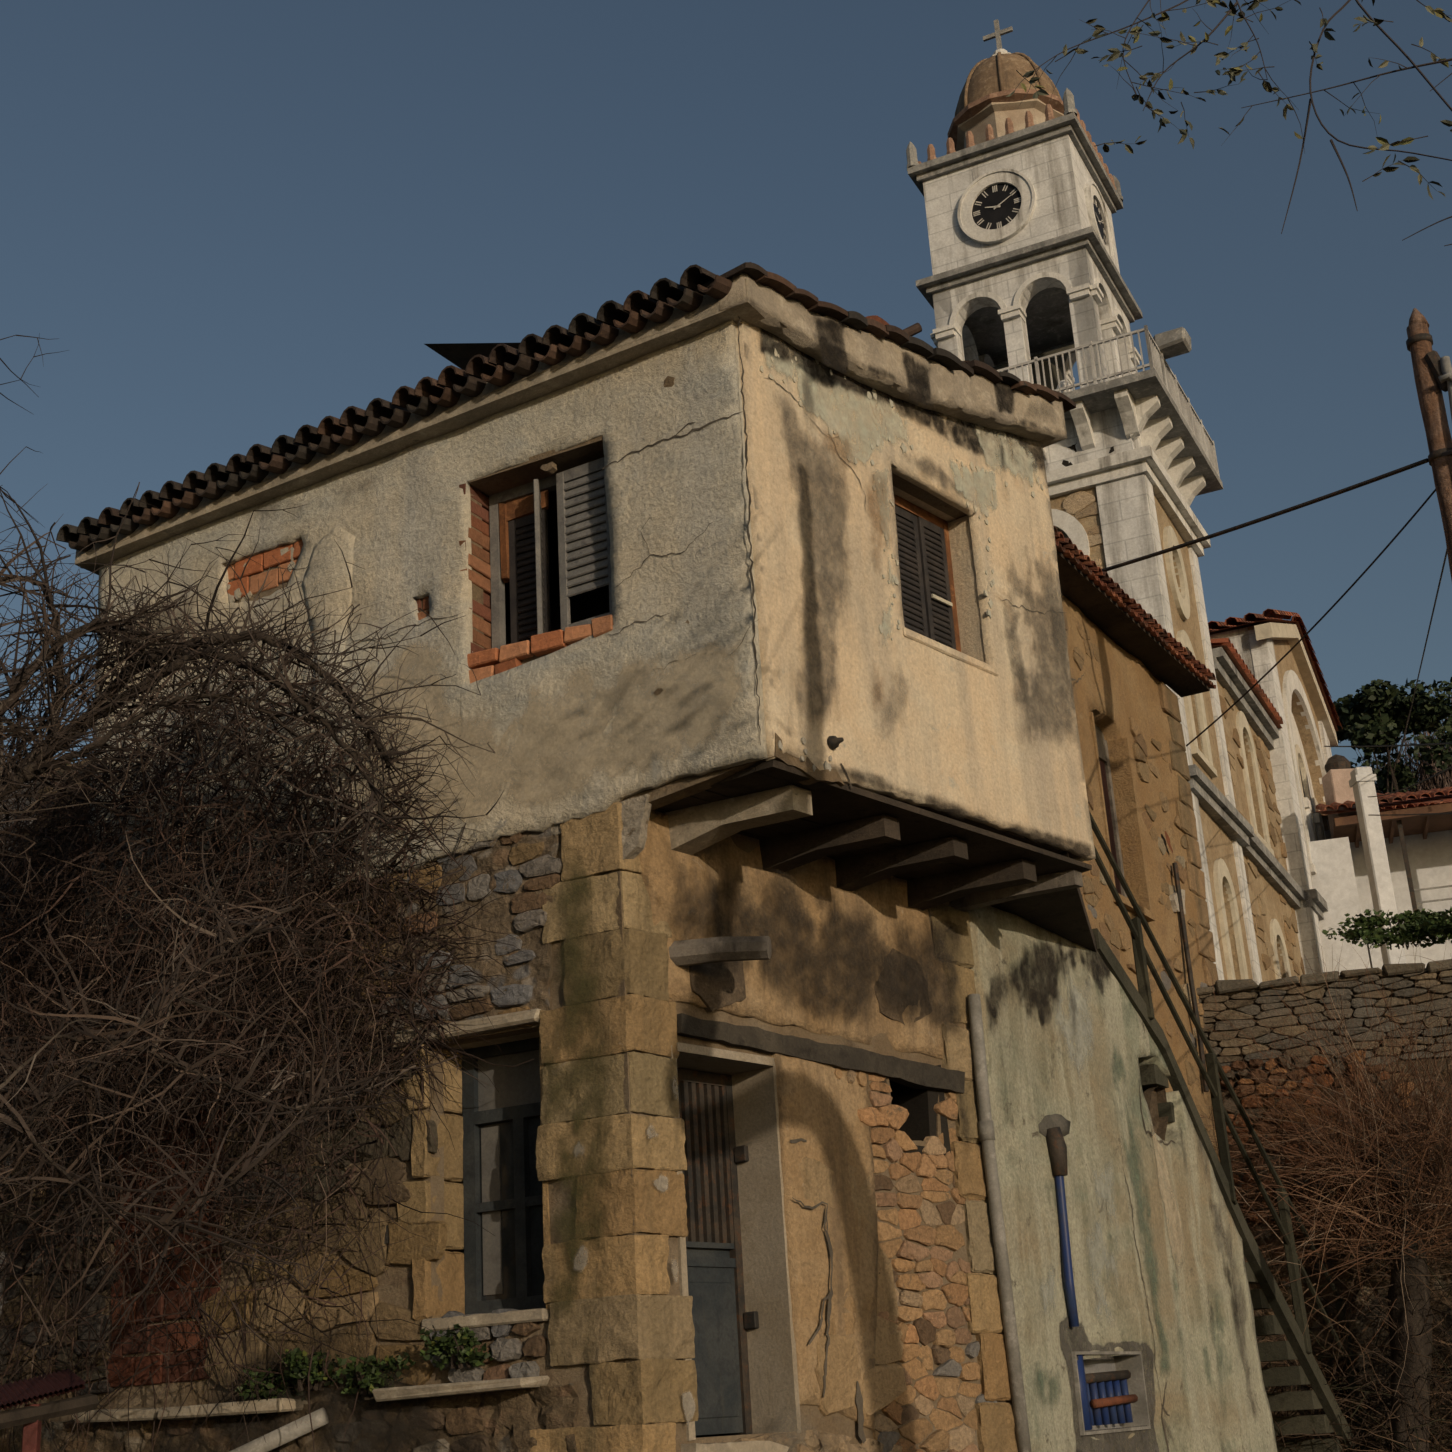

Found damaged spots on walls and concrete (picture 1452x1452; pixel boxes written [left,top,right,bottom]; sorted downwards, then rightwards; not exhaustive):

damp [761,317,1048,470]
spalling [227,539,303,603]
crack [602,317,866,745]
damp [785,408,847,716]
damp [919,460,956,488]
damp [1008,570,1072,732]
damp [676,873,960,1029]
damp [987,940,1110,1071]
spalling [857,1073,997,1452]